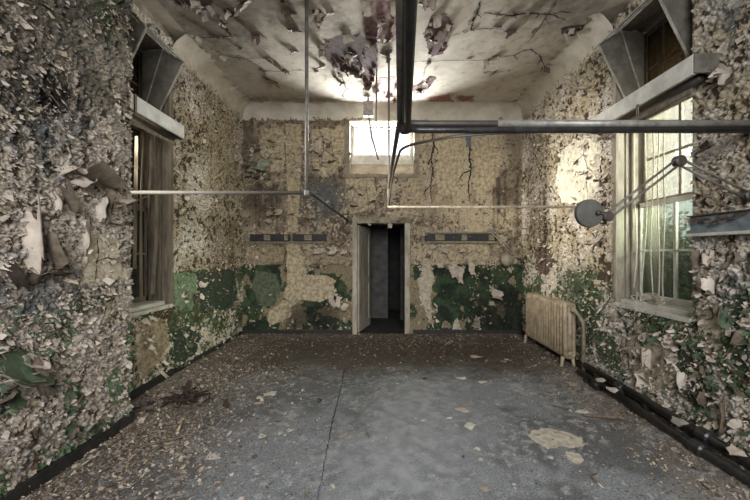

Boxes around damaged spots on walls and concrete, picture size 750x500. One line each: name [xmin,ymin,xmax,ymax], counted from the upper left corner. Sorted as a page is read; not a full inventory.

peeling [316,0,397,103]
peeling [418,0,453,57]
crack [414,0,571,77]
peeling [525,53,611,120]
spalling [697,0,750,88]
crack [424,133,438,200]
crack [458,147,473,201]
peeling [0,0,305,491]
peeling [245,125,750,455]
crack [317,366,345,500]
spalling [528,428,585,465]